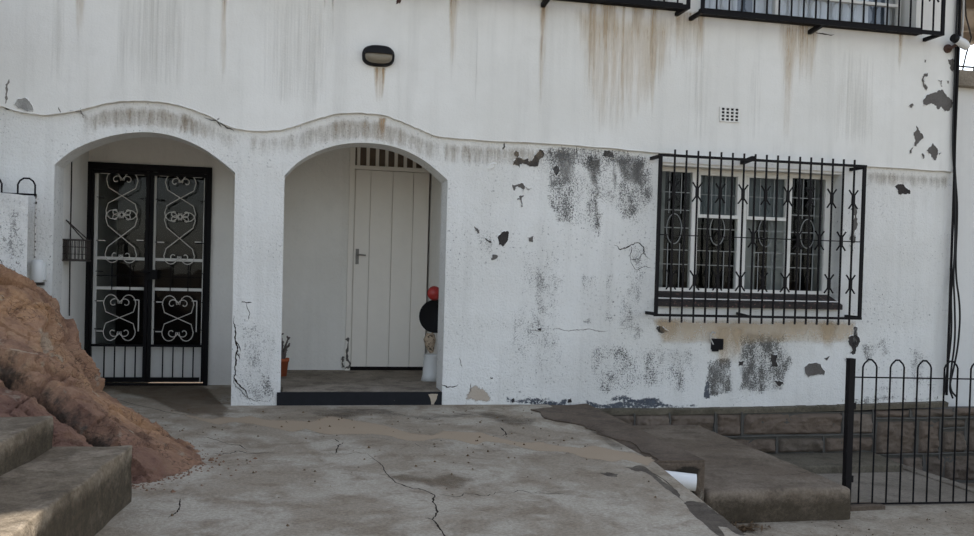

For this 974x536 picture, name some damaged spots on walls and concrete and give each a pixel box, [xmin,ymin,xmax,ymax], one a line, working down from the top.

peeling [908,58,954,111]
peeling [513,149,545,168]
peeling [909,126,941,160]
water stain [543,147,652,235]
peeling [474,226,510,261]
crack [615,242,651,270]
crack [233,301,268,402]
spalling [467,386,489,401]
water stain [507,397,567,405]
water stain [586,346,692,408]
water stain [704,332,791,399]
crack [331,439,562,536]